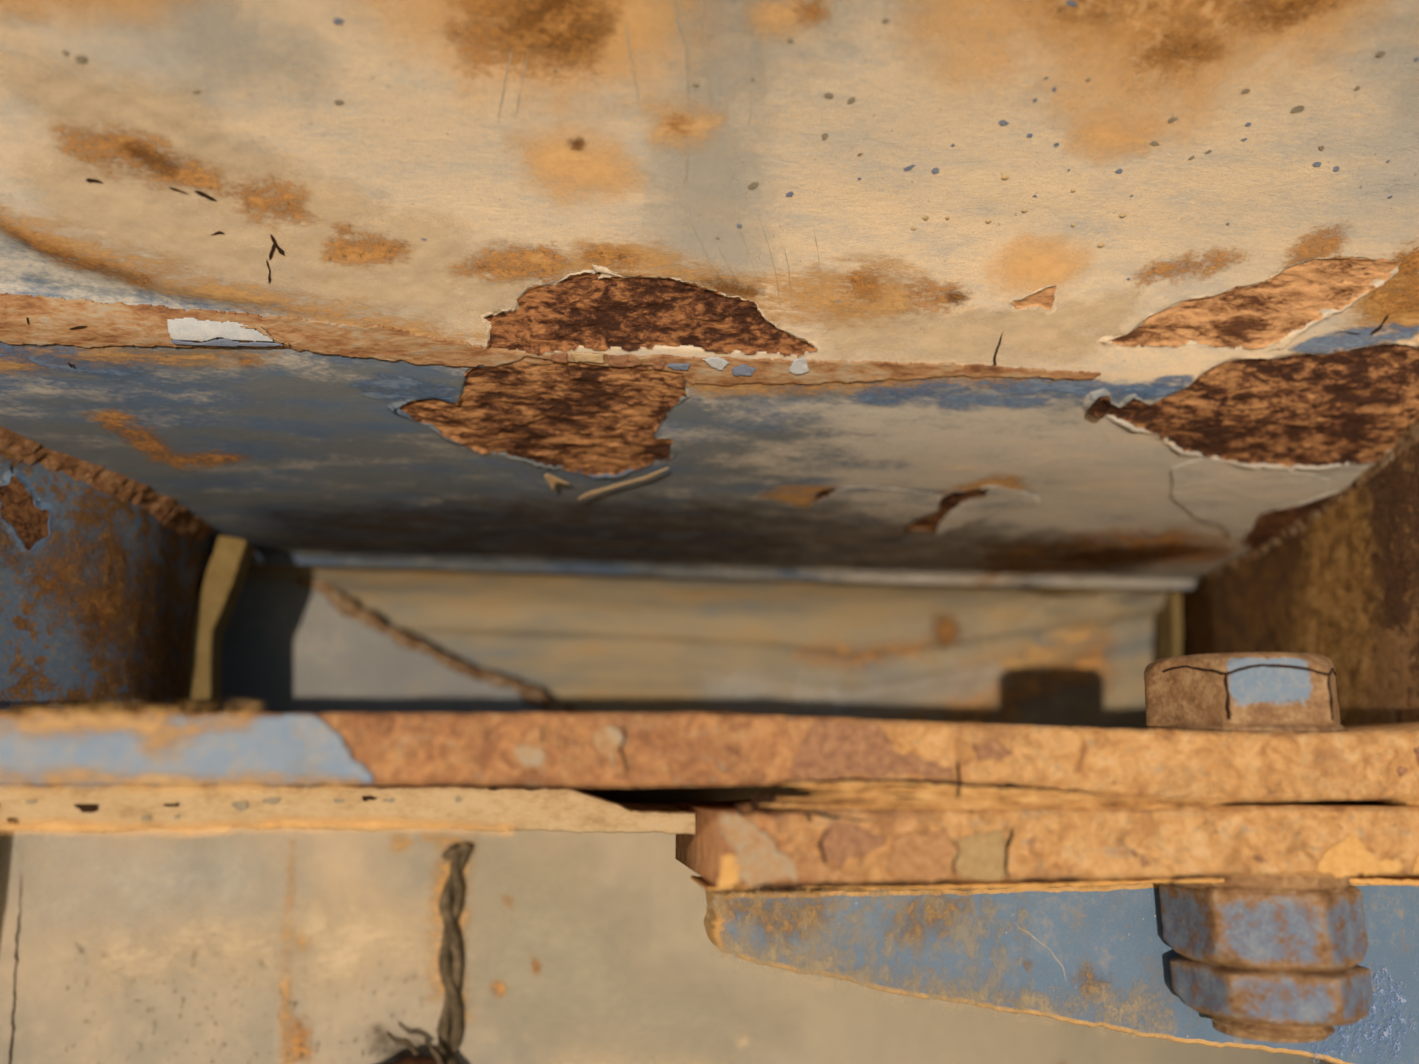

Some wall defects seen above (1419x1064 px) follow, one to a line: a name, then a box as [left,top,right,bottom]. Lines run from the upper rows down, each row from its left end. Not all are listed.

corrosion [420,0,675,75]
corrosion [923,0,1348,99]
corrosion [93,410,241,468]
peeling [386,264,821,500]
peeling [1080,252,1419,553]
corrosion [1291,488,1378,725]
corrosion [10,710,249,751]
corrosion [513,723,550,769]
corrosion [592,725,628,772]
corrosion [714,714,1233,987]
corrosion [1316,833,1419,878]
corrosion [428,837,473,991]